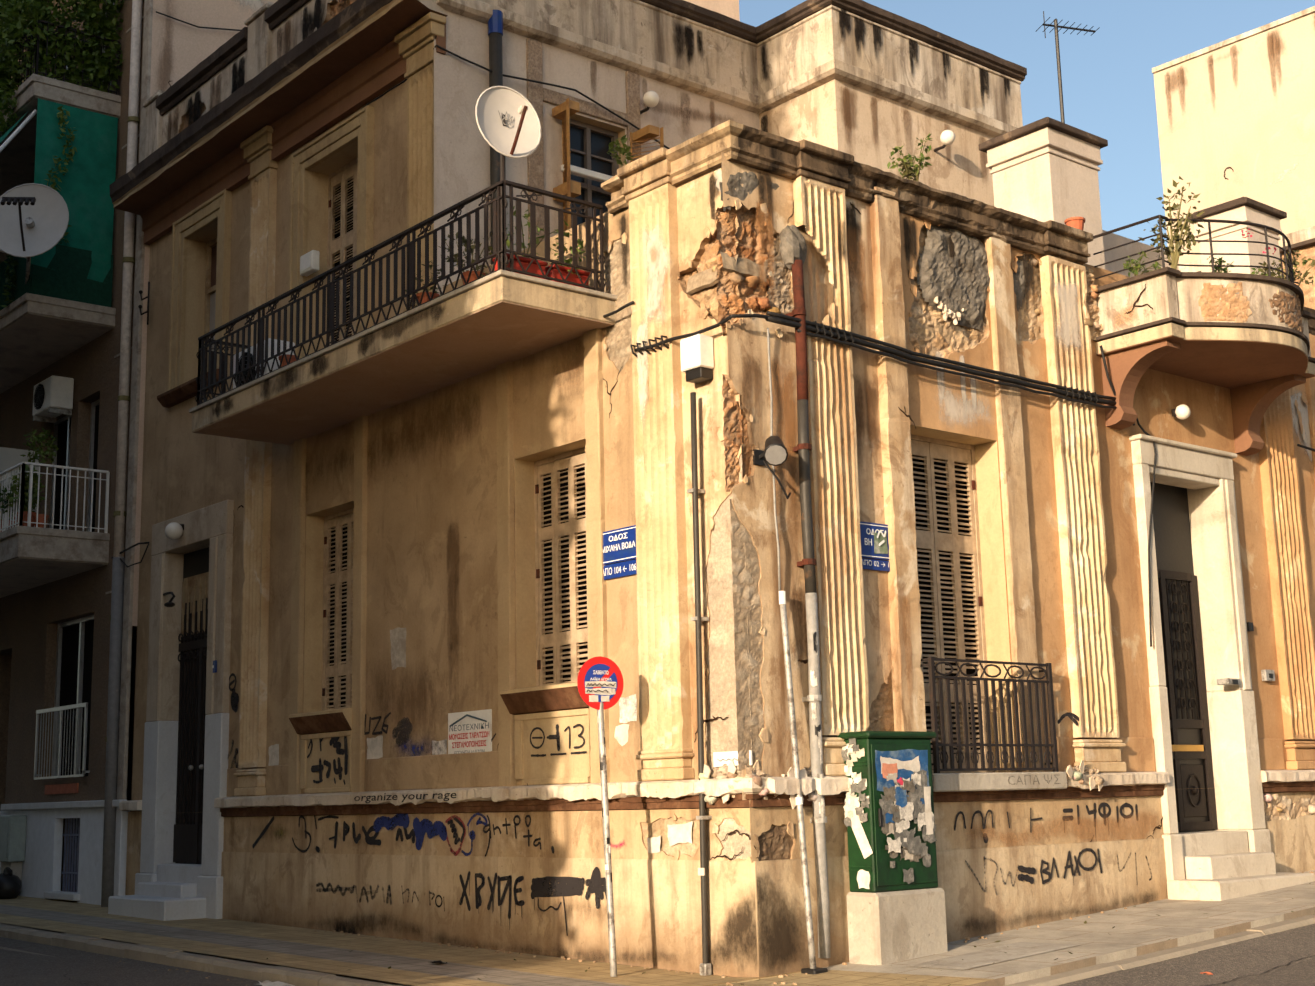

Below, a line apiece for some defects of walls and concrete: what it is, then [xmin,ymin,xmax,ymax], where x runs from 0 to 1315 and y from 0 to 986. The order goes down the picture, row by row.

damp [839,8,881,57]
damp [909,36,918,73]
damp [979,64,1010,101]
spalling [678,199,794,338]
spalling [908,220,986,360]
peeling [1291,392,1315,481]
spalling [641,374,818,862]